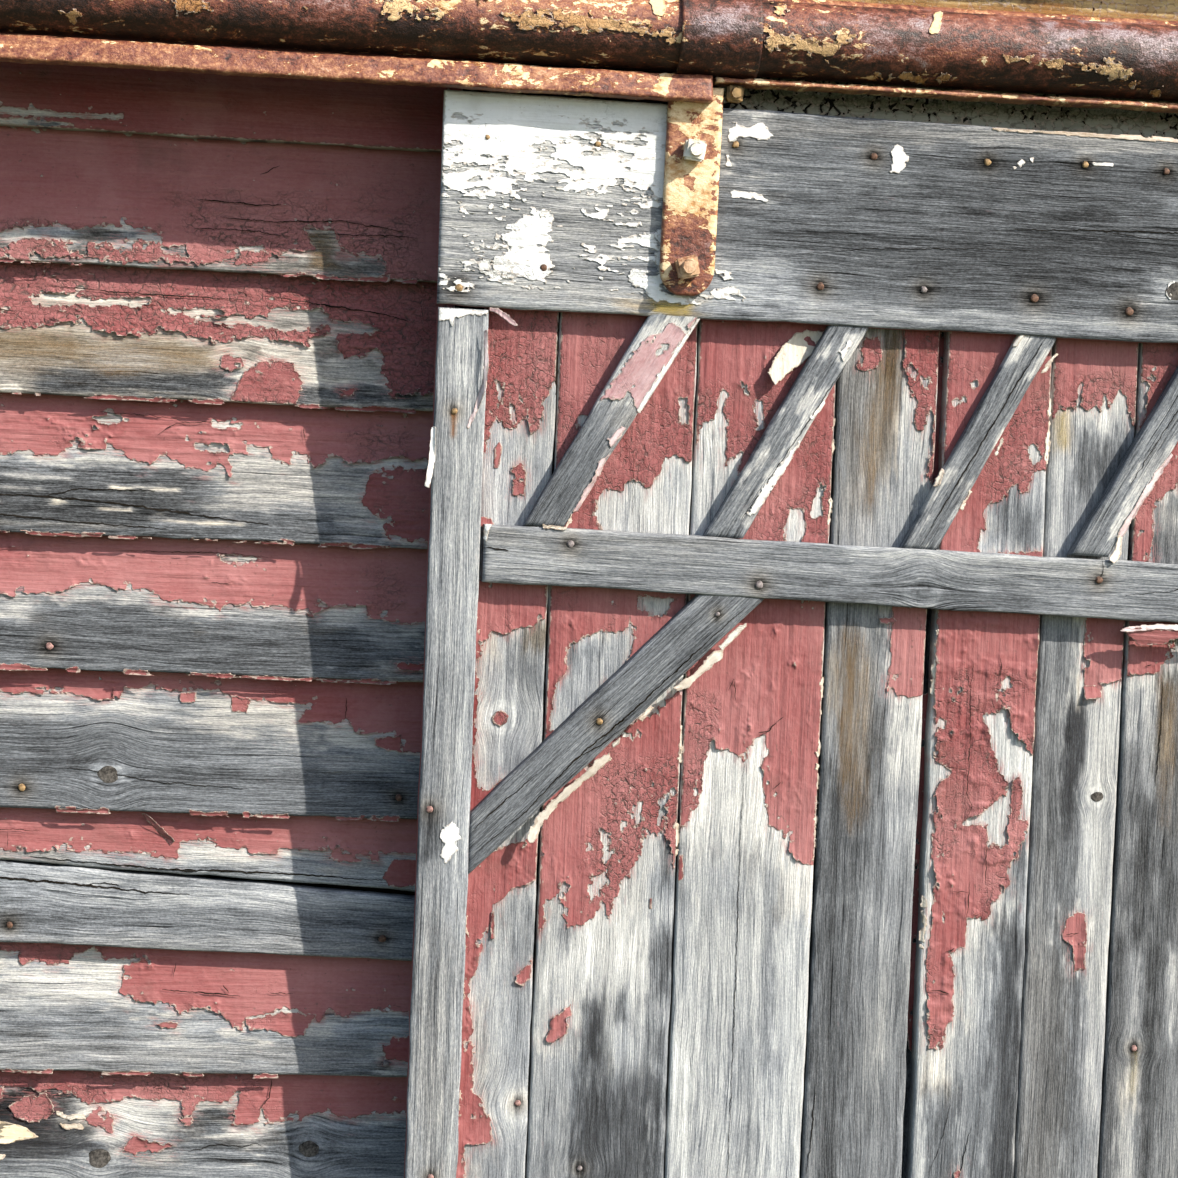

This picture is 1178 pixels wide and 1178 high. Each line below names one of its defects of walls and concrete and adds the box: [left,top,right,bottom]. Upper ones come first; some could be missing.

peeling [380,0,445,22]
peeling [500,0,676,45]
peeling [763,2,857,64]
peeling [718,54,1178,167]
peeling [0,62,836,626]
peeling [1083,618,1178,700]
peeling [0,662,424,753]
peeling [0,805,417,888]
peeling [456,579,825,1178]
peeling [879,606,1040,1052]
peeling [0,942,412,1038]
peeling [0,1068,407,1134]